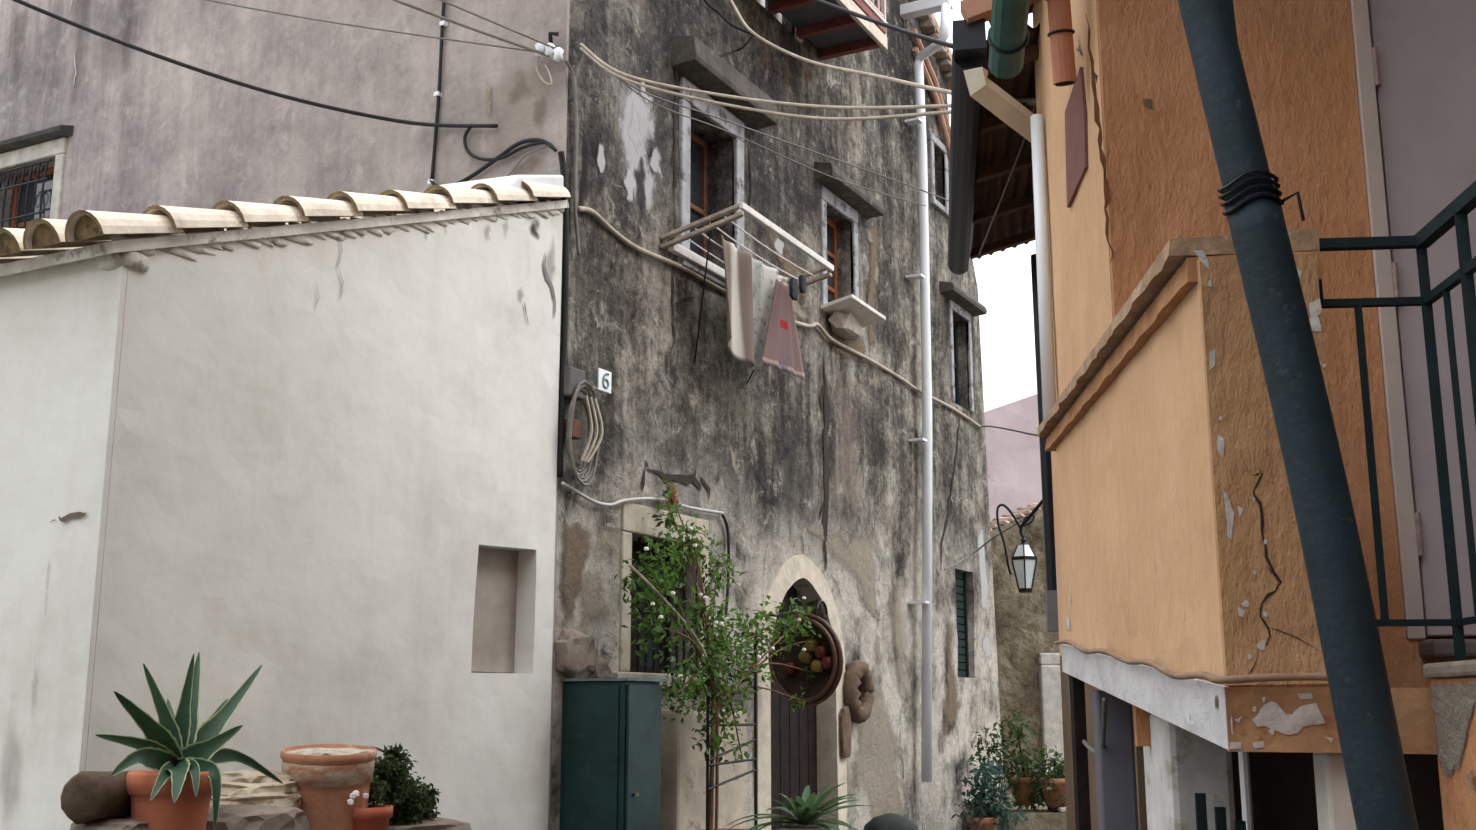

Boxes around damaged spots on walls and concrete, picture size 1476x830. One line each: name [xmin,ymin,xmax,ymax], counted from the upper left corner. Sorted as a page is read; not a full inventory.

peeling [1194,250,1212,287]
peeling [1309,298,1322,331]
peeling [1223,491,1255,540]
crack [1245,465,1320,673]
peeling [1238,600,1268,618]
peeling [1229,693,1333,749]
spalling [1431,681,1476,789]